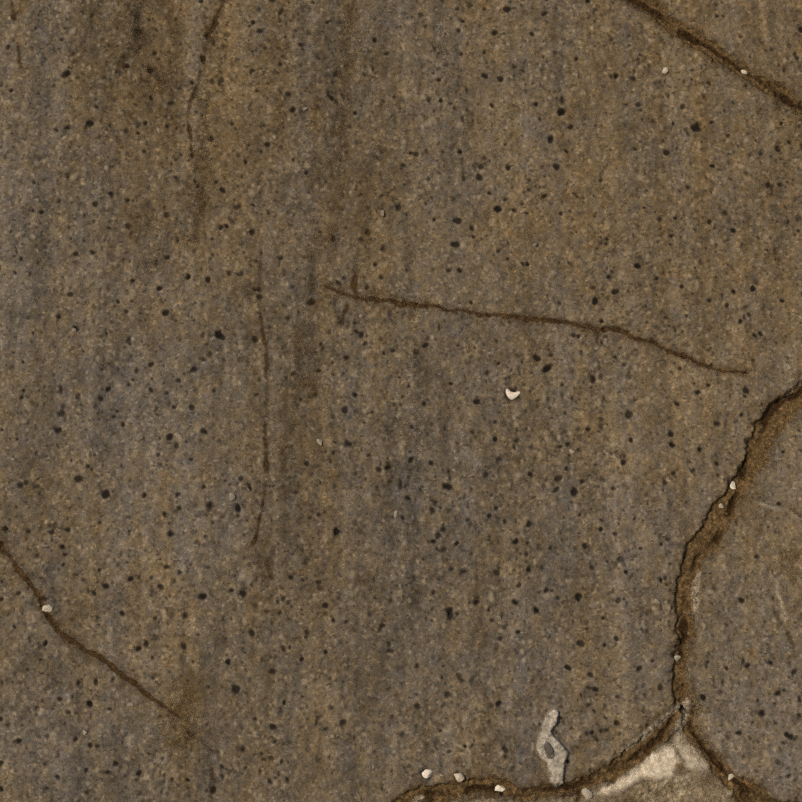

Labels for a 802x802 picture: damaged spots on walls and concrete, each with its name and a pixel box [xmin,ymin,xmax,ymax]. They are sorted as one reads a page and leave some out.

crack [205,2,223,49]
crack [624,0,802,118]
crack [187,85,197,156]
crack [325,274,750,376]
crack [0,542,193,737]
crack [393,376,802,802]